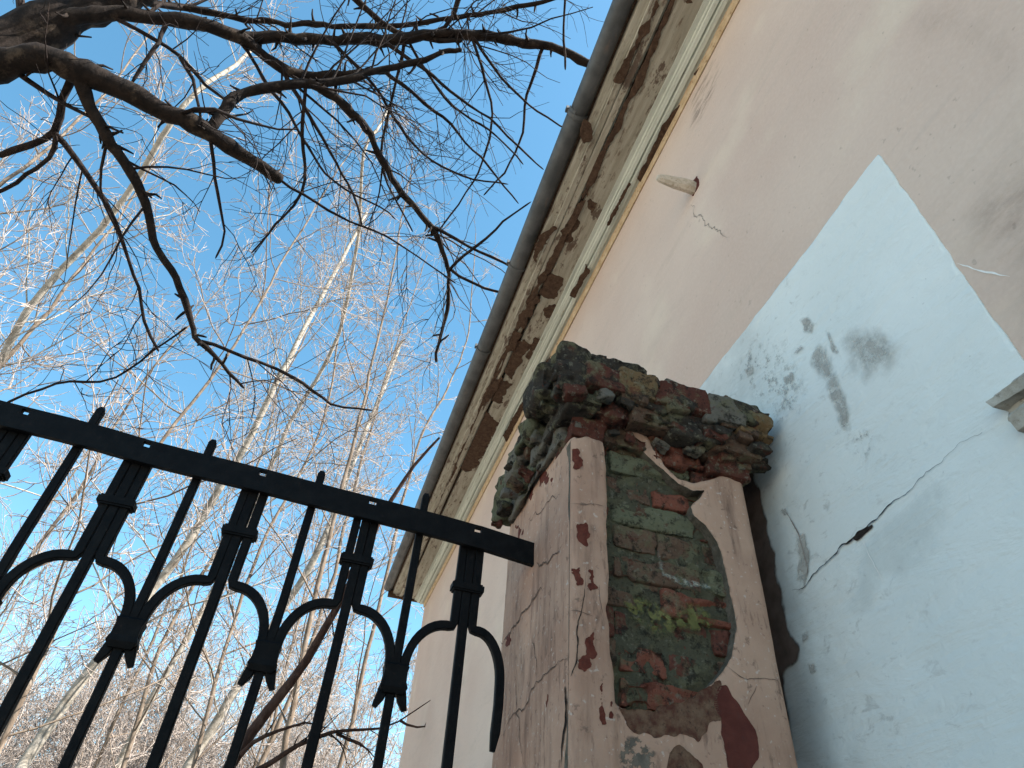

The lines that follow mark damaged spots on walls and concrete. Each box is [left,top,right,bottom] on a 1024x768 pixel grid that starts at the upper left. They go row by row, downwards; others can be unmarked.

peeling [434,0,693,513]
leakage [746,356,793,409]
leakage [795,334,847,426]
peeling [576,523,590,547]
peeling [571,568,598,591]
peeling [782,509,809,584]
crack [793,434,980,590]
crack [501,551,603,764]
peeling [578,632,597,672]
peeling [599,680,759,768]